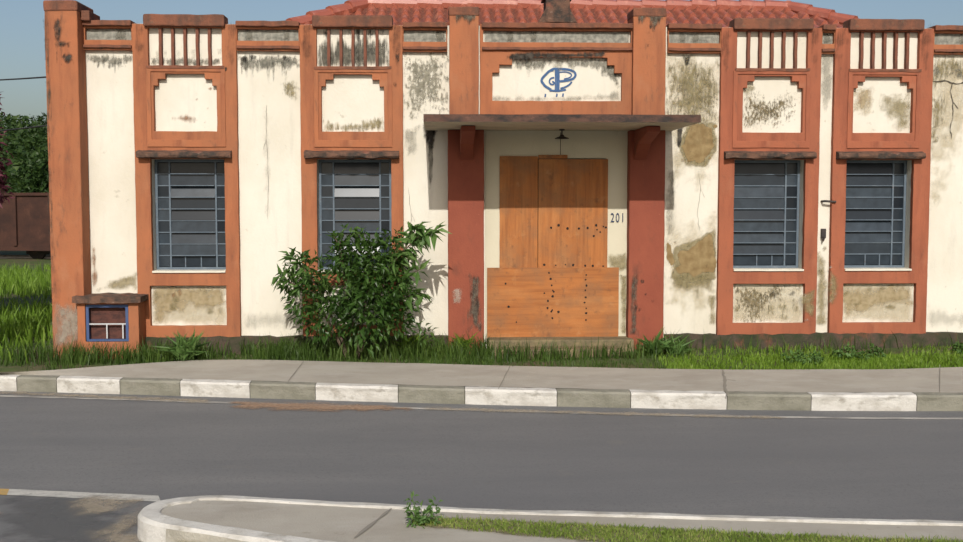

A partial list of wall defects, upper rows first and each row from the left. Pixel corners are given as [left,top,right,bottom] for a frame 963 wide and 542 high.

leakage [86,29,132,67]
leakage [238,29,304,69]
leakage [319,29,449,114]
leakage [485,31,629,99]
leakage [327,119,381,131]
leakage [406,127,436,182]
flaking render [677,123,717,166]
leakage [742,86,793,127]
crack [933,80,963,139]
flaking render [666,231,717,283]
leakage [154,287,223,321]
leakage [734,287,797,321]